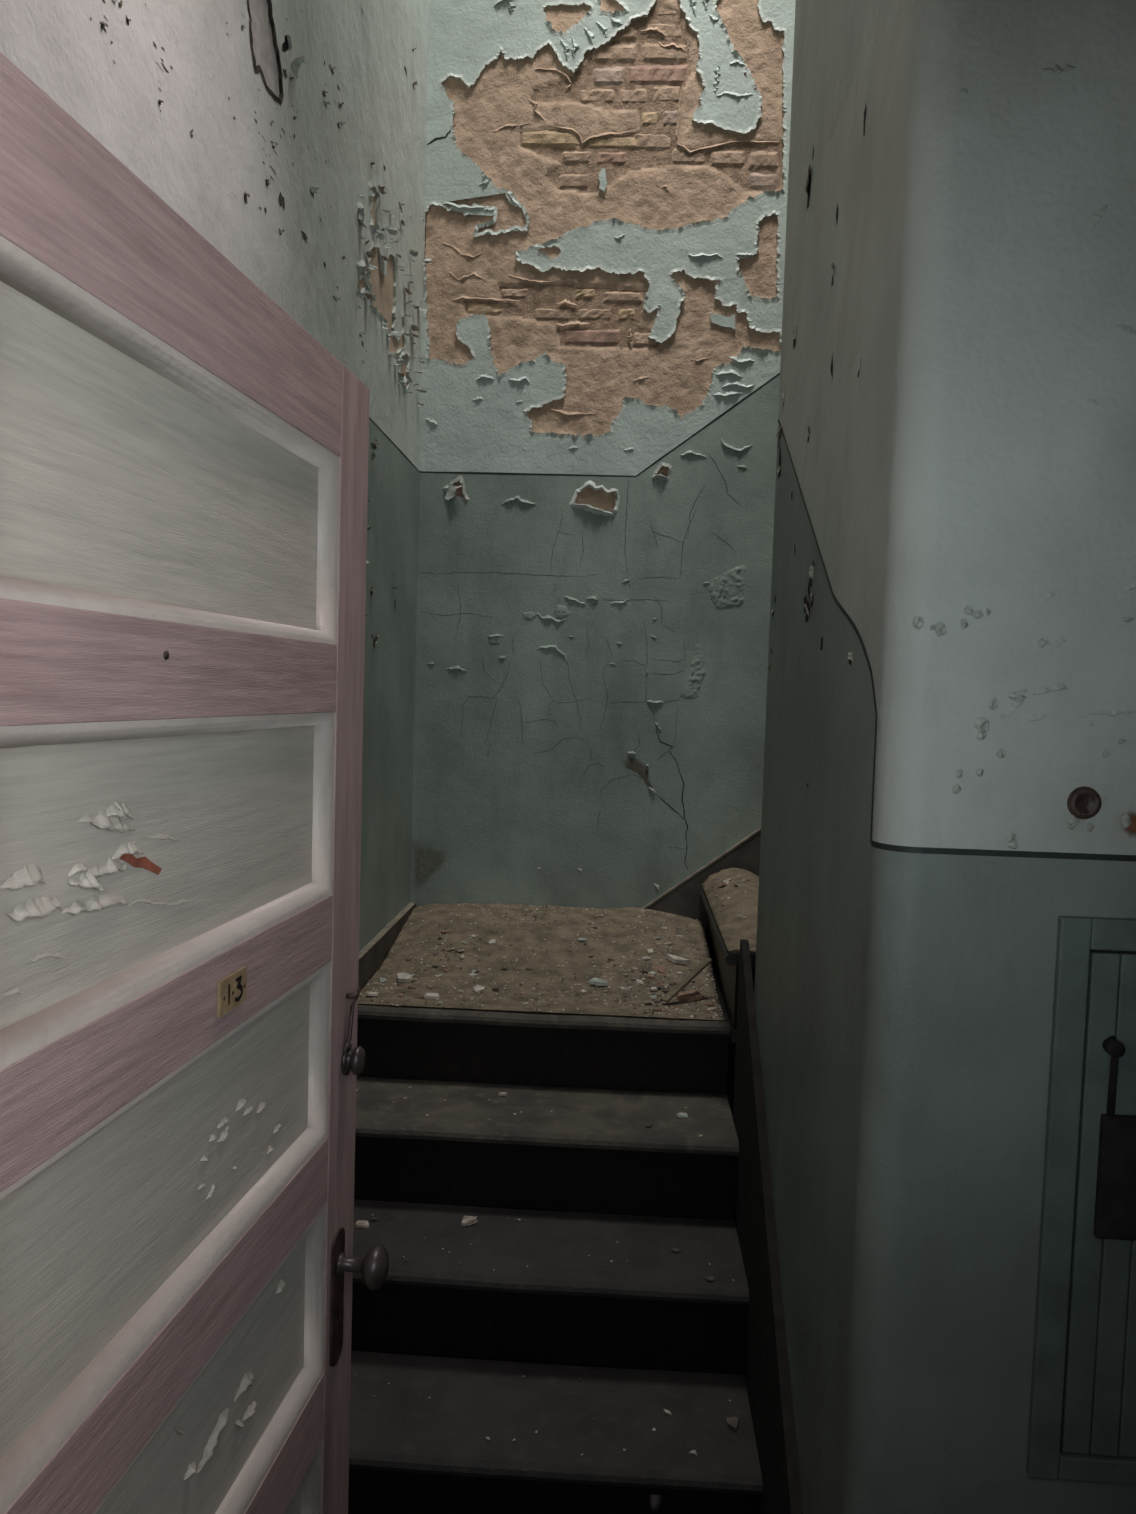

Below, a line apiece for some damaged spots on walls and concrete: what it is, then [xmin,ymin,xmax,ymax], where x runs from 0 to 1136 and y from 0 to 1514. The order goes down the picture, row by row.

peeling [90,0,131,72]
peeling [806,147,814,212]
flaking render [323,0,797,449]
peeling [721,439,751,468]
peeling [442,475,470,502]
peeling [502,496,537,505]
peeling [569,480,620,517]
peeling [565,579,629,605]
peeling [803,559,814,622]
peeling [534,613,574,661]
crack [420,454,737,869]